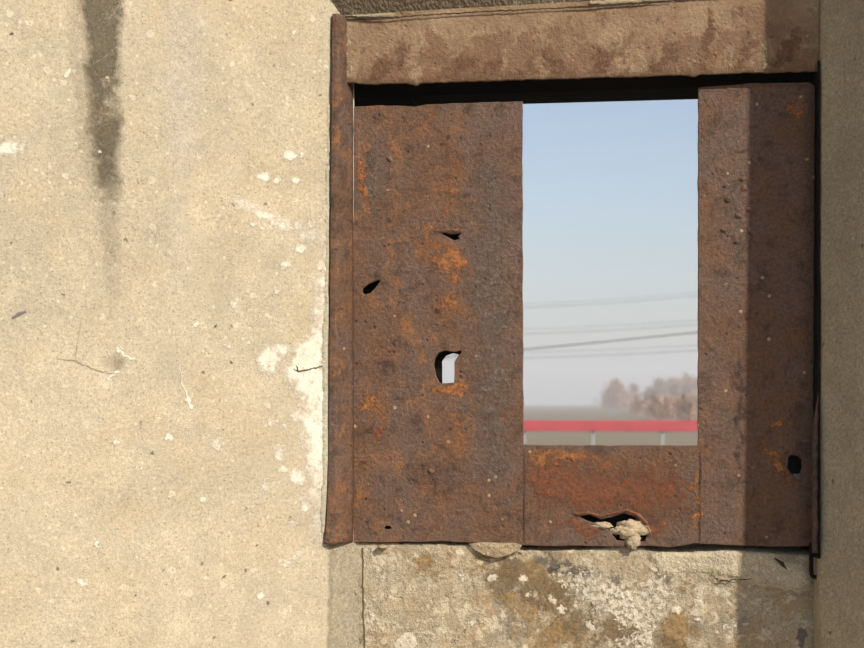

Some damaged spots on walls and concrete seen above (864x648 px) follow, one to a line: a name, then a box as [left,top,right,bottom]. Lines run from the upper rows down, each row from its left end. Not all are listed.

corrosion [700,8,716,52]
water stain [83,0,122,187]
corrosion [421,240,467,310]
crack [60,318,114,374]
corrosion [530,449,617,472]
peeling [625,534,641,550]
water stain [548,561,681,648]
water stain [393,632,417,648]